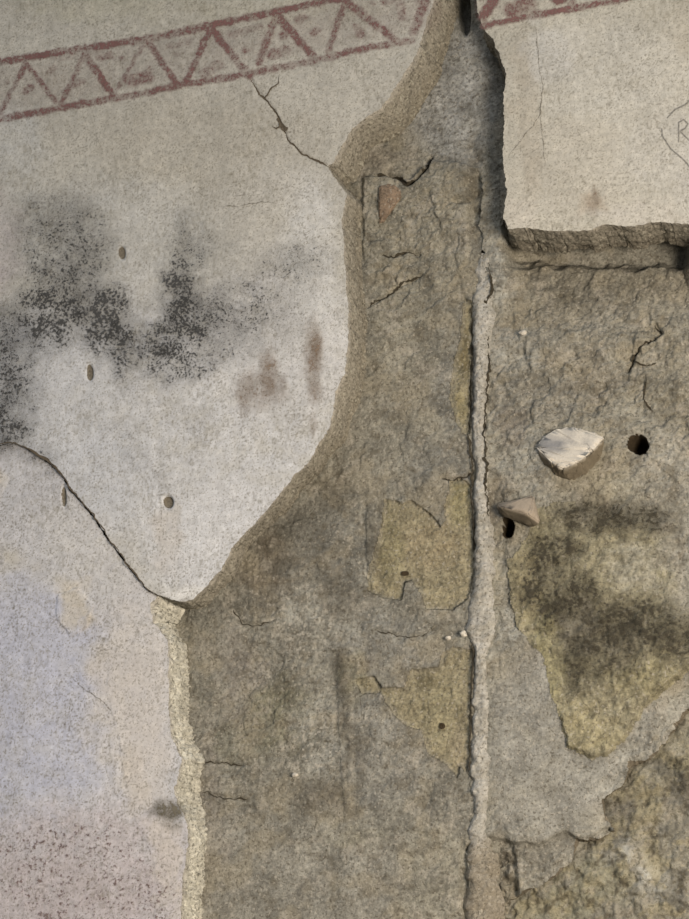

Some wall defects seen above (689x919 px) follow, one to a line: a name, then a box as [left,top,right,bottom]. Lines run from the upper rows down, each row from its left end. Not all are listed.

crack [251,77,328,167]
crack [0,442,158,596]
leakage [0,197,319,449]
spalling [79,0,507,919]
spalling [478,174,689,919]
crack [629,326,662,410]